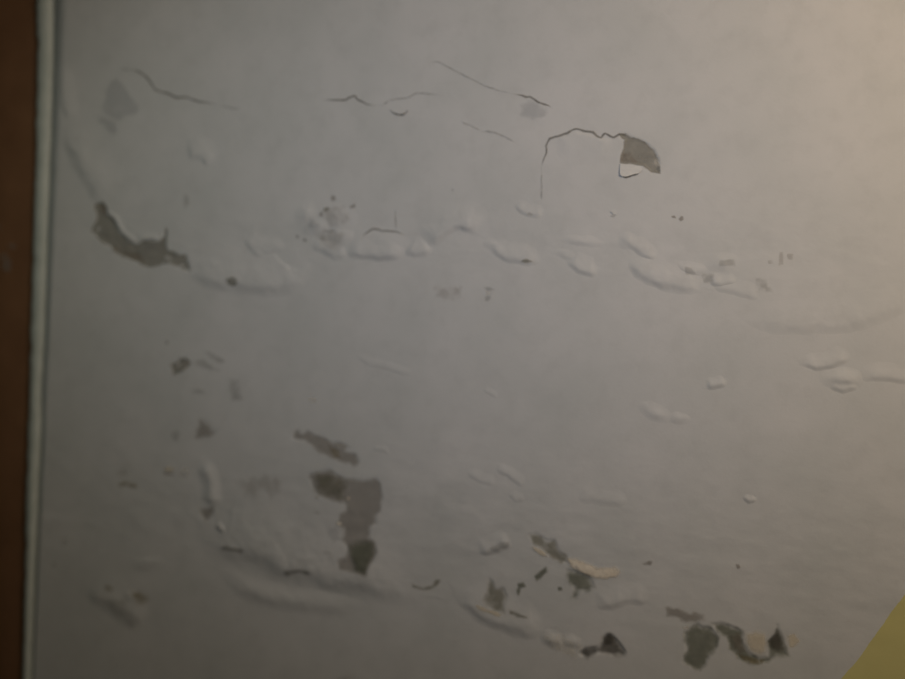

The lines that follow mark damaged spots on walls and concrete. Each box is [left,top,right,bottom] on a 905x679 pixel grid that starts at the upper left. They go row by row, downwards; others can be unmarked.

flaking render [620,134,660,178]
flaking render [92,203,189,270]
peeling [352,542,372,572]
flaking render [533,536,619,589]
flaking render [583,635,623,656]
flaking render [685,625,798,668]